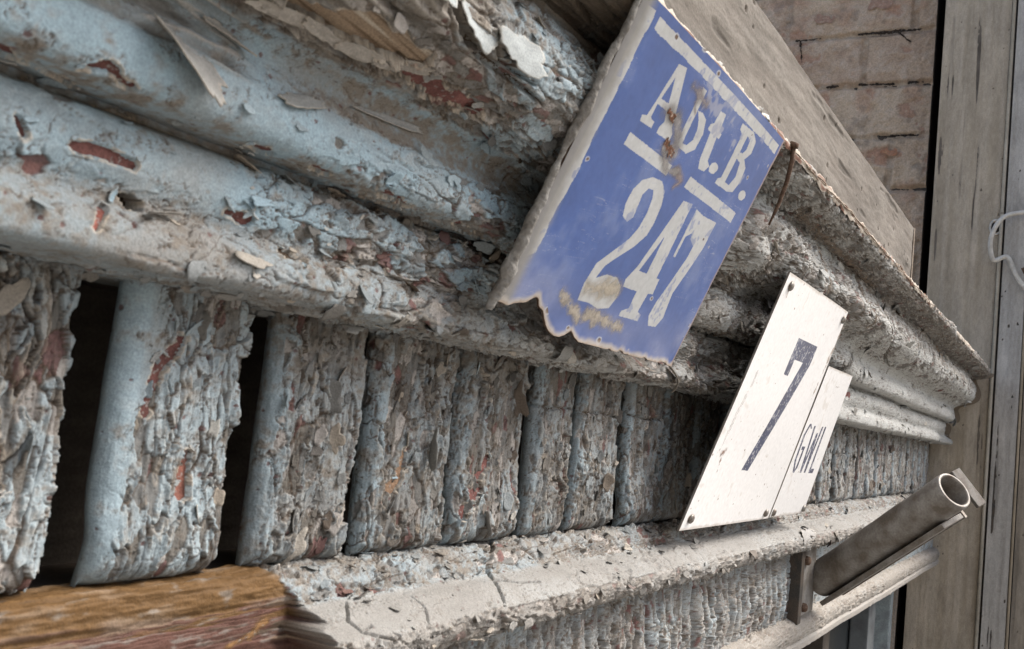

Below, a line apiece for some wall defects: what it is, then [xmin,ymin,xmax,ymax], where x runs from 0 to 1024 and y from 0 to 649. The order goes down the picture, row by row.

peeling [36,60,134,91]
peeling [154,13,229,107]
peeling [243,0,484,120]
peeling [444,0,560,81]
peeling [69,134,142,170]
peeling [224,141,383,239]
peeling [0,271,31,316]
peeling [134,245,311,430]
peeling [320,248,597,575]
peeling [769,291,985,558]
peeling [166,444,226,524]
peeling [274,467,459,602]